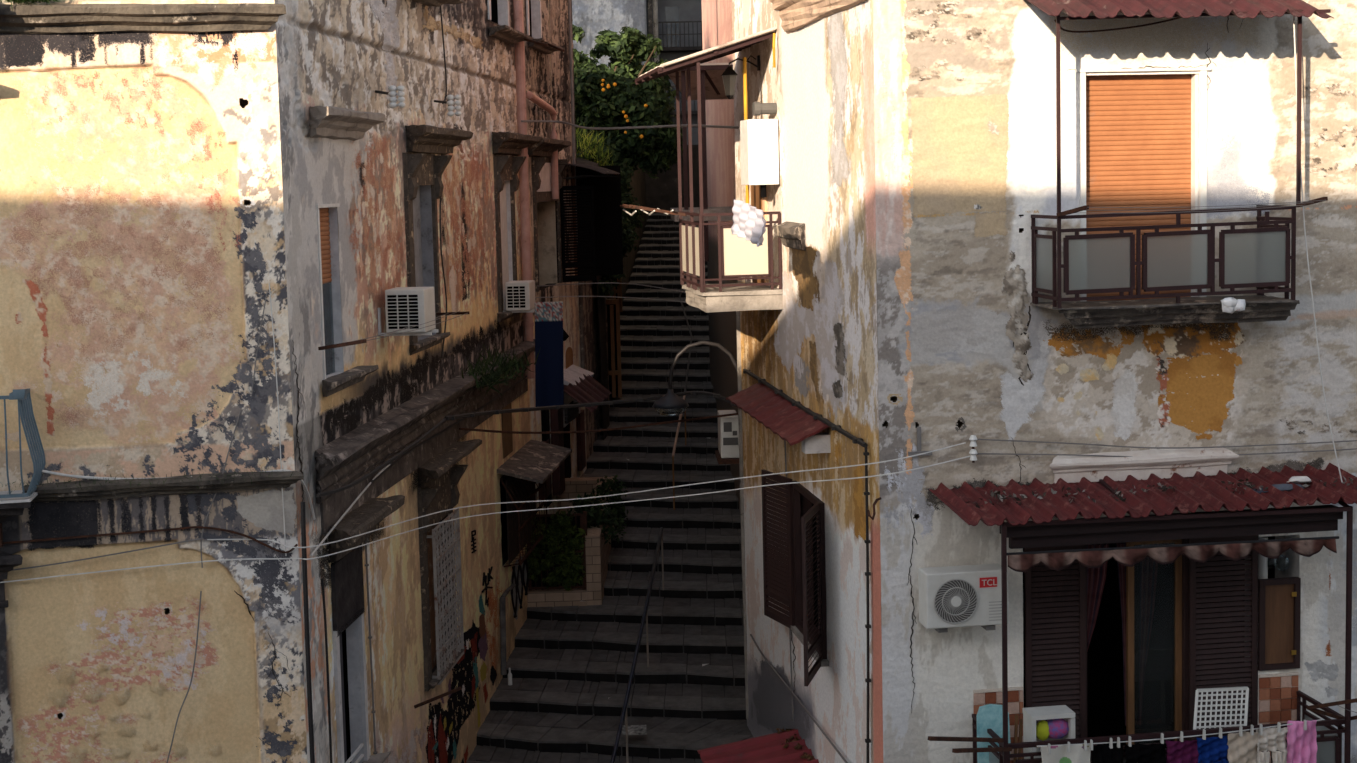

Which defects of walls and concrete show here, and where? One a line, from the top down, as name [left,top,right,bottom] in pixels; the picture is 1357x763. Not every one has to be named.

peeling [0,31,287,484]
leakage [317,319,516,440]
peeling [1001,250,1246,441]
leakage [96,494,203,544]
peeling [248,530,301,624]
peeling [15,596,219,763]
peeling [256,649,301,763]